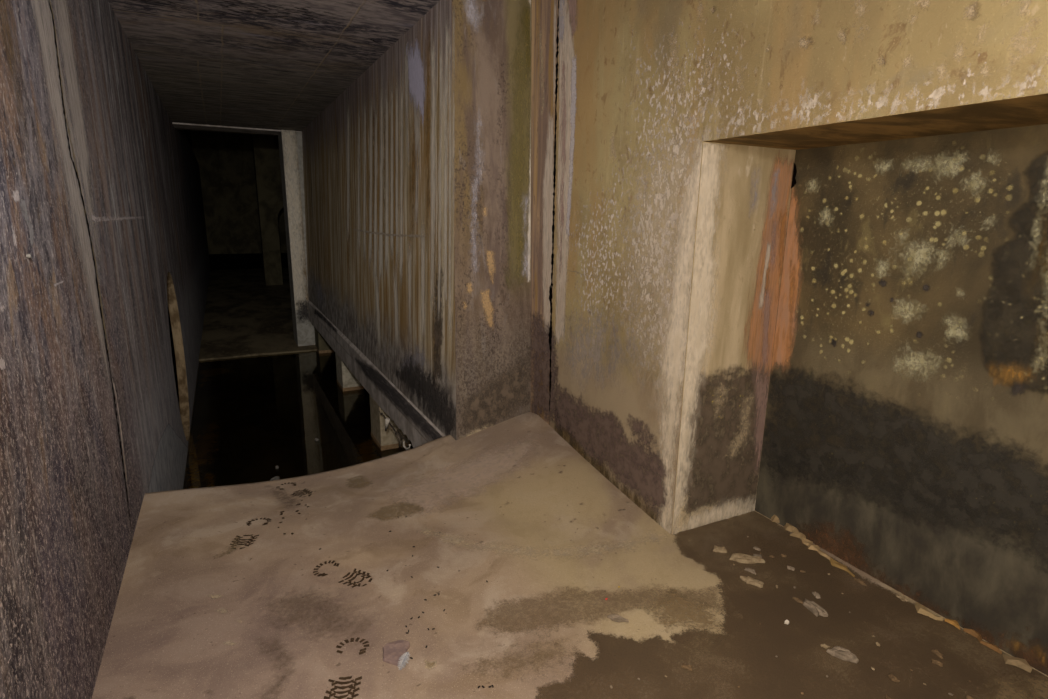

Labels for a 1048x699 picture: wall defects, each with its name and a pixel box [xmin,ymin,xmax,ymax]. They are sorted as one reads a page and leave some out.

damp [281,130,337,332]
damp [347,22,667,526]
crack [548,0,559,425]
damp [525,0,776,379]
rust [747,158,800,466]
damp [792,95,840,121]
damp [858,83,944,112]
damp [801,152,1048,394]
damp [479,365,1048,699]